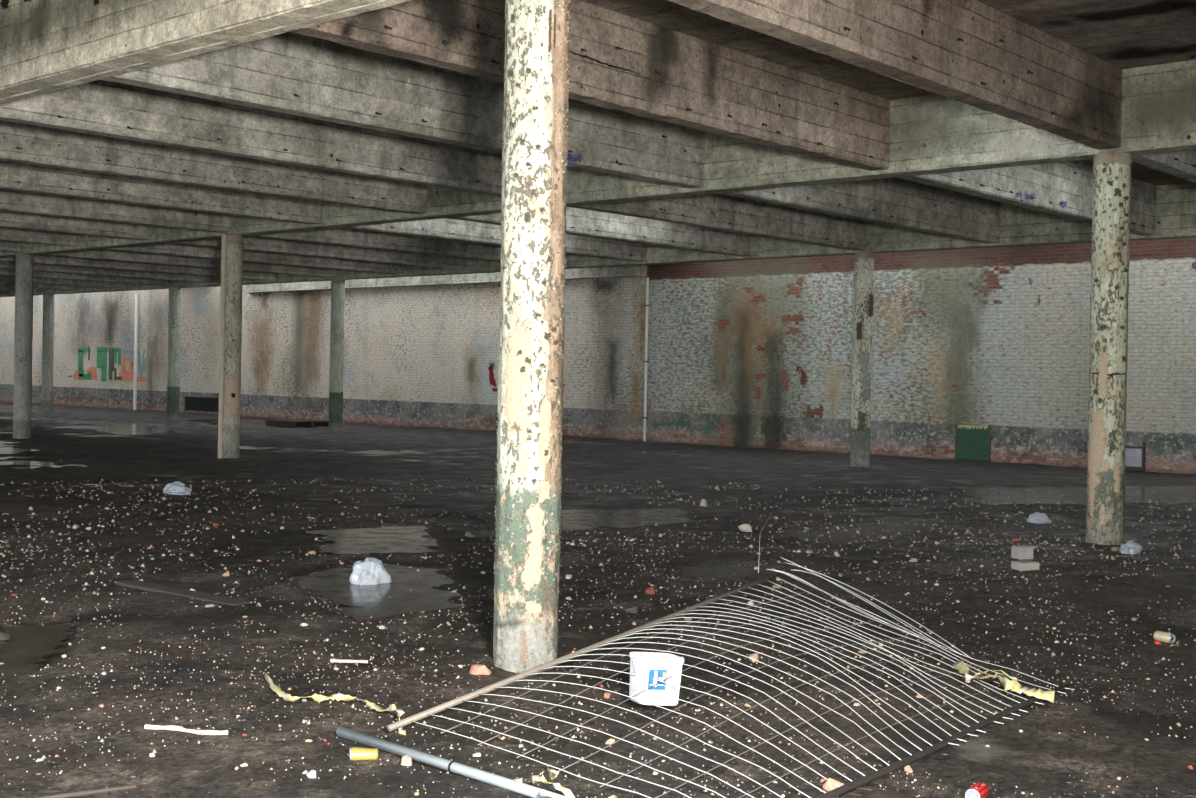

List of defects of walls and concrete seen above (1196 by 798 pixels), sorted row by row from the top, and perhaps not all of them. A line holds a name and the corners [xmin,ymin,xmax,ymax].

crack [569,51,640,74]
peeling [471,0,571,615]
peeling [782,277,806,336]
peeling [968,258,1015,305]
water stain [722,282,785,439]
peeling [1086,168,1132,525]
peeling [780,365,823,420]